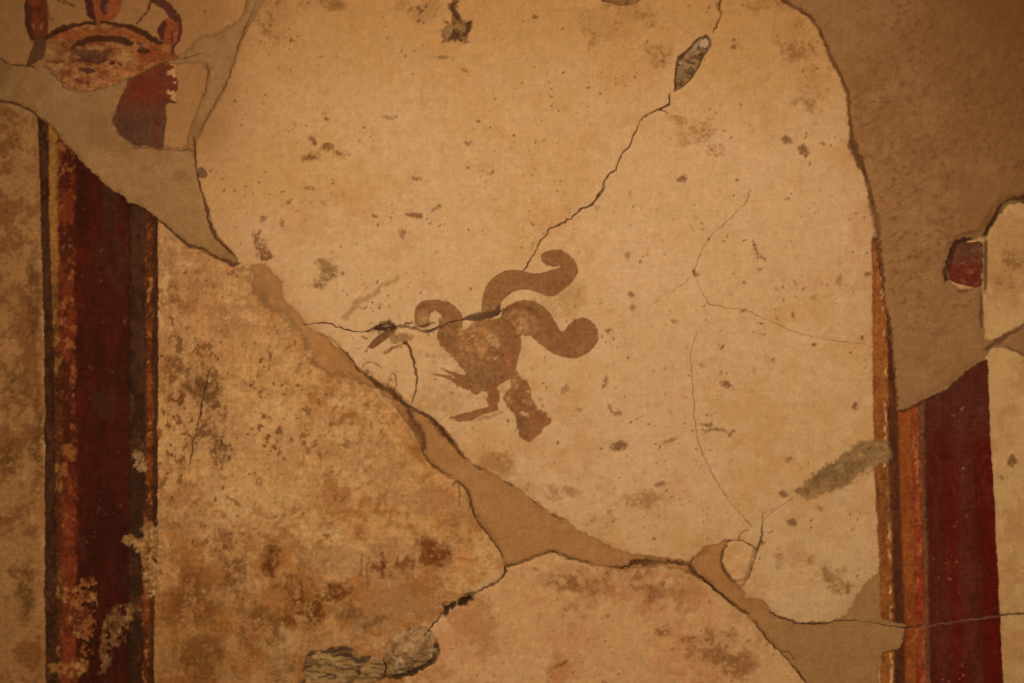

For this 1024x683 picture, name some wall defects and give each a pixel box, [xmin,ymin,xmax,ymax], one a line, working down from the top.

spalling [442,0,472,43]
spalling [663,35,711,91]
crack [524,95,670,270]
spalling [462,304,500,321]
crack [317,320,464,458]
spalling [780,440,893,499]
peeling [721,540,763,582]
spalling [443,596,473,615]
crack [767,612,856,646]
spalling [301,646,386,683]